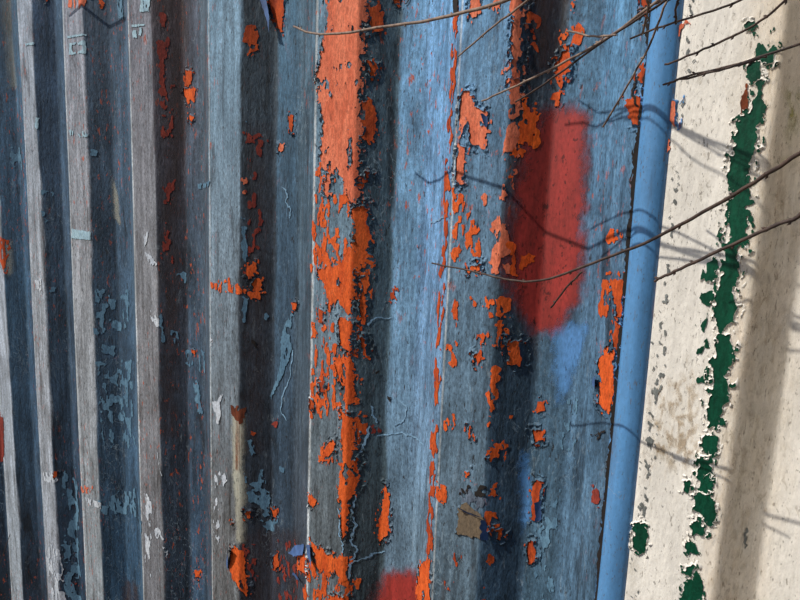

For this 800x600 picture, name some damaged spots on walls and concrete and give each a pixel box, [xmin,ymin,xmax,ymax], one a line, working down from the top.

peeling [464,0,541,200]
peeling [547,23,585,109]
peeling [450,83,535,279]
peeling [270,0,404,600]
peeling [446,341,458,368]
peeling [468,296,531,427]
peeling [525,394,549,448]
peeling [592,271,626,419]
peeling [695,257,719,354]
peeling [228,542,259,600]
peeling [435,480,447,505]
peeling [678,429,724,600]